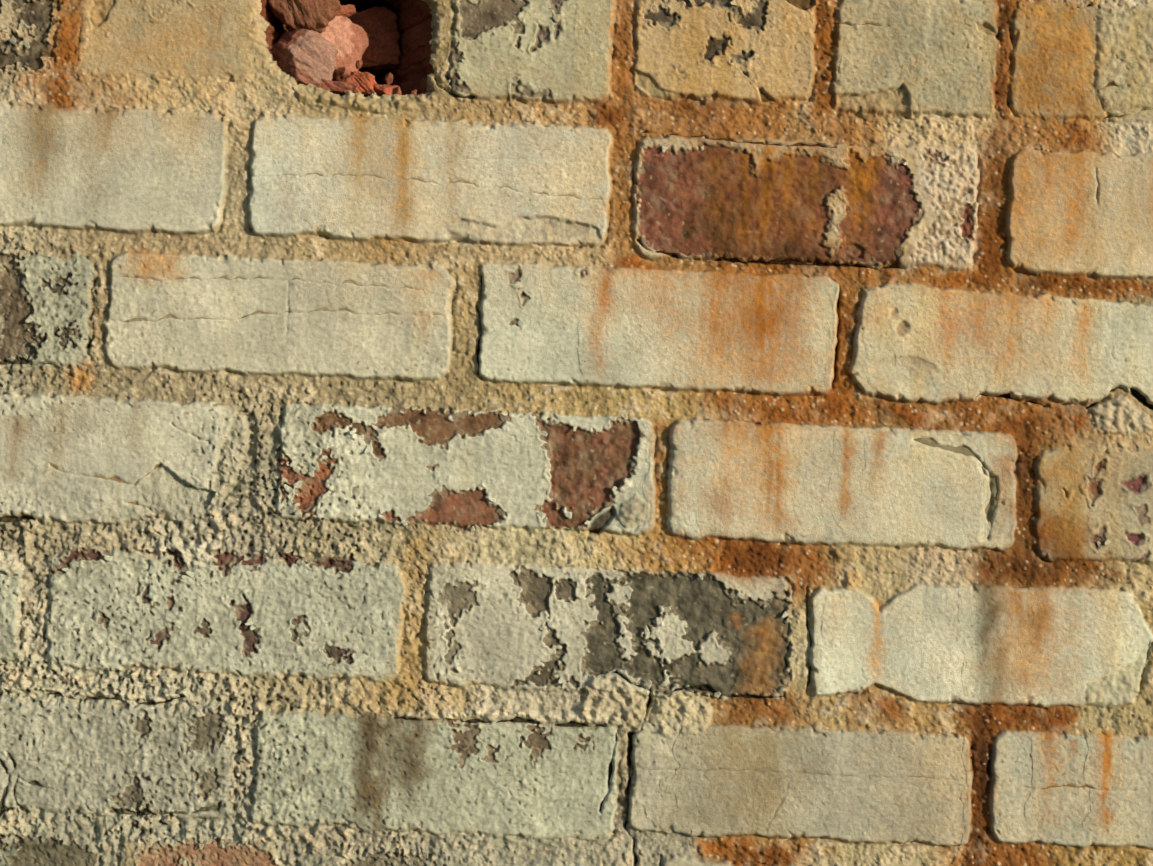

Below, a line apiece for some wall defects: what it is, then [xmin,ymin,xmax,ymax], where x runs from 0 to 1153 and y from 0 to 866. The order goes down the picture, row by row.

spalling [339,0,567,100]
rust [0,0,609,349]
peeling [0,253,94,364]
rust [61,355,101,400]
peeling [212,546,354,577]
peeling [277,407,512,523]
peeling [380,485,507,534]
peeling [531,412,643,532]
rust [573,0,1153,866]
peeling [508,566,791,699]
crack [394,715,431,723]
crack [461,588,934,866]